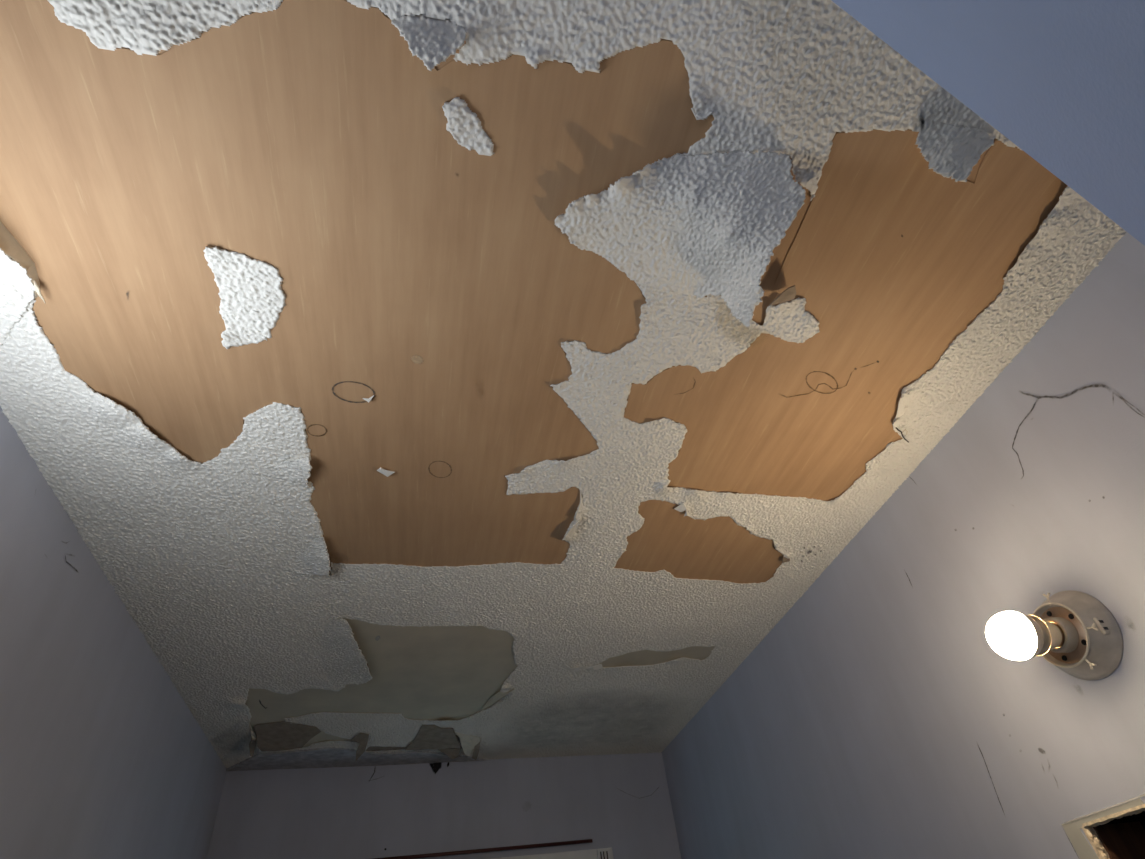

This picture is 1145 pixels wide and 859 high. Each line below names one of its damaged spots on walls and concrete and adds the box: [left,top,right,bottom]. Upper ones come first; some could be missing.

peeling [0,0,1068,584]
crack [1012,384,1141,476]
peeling [246,618,517,774]
peeling [565,646,715,671]